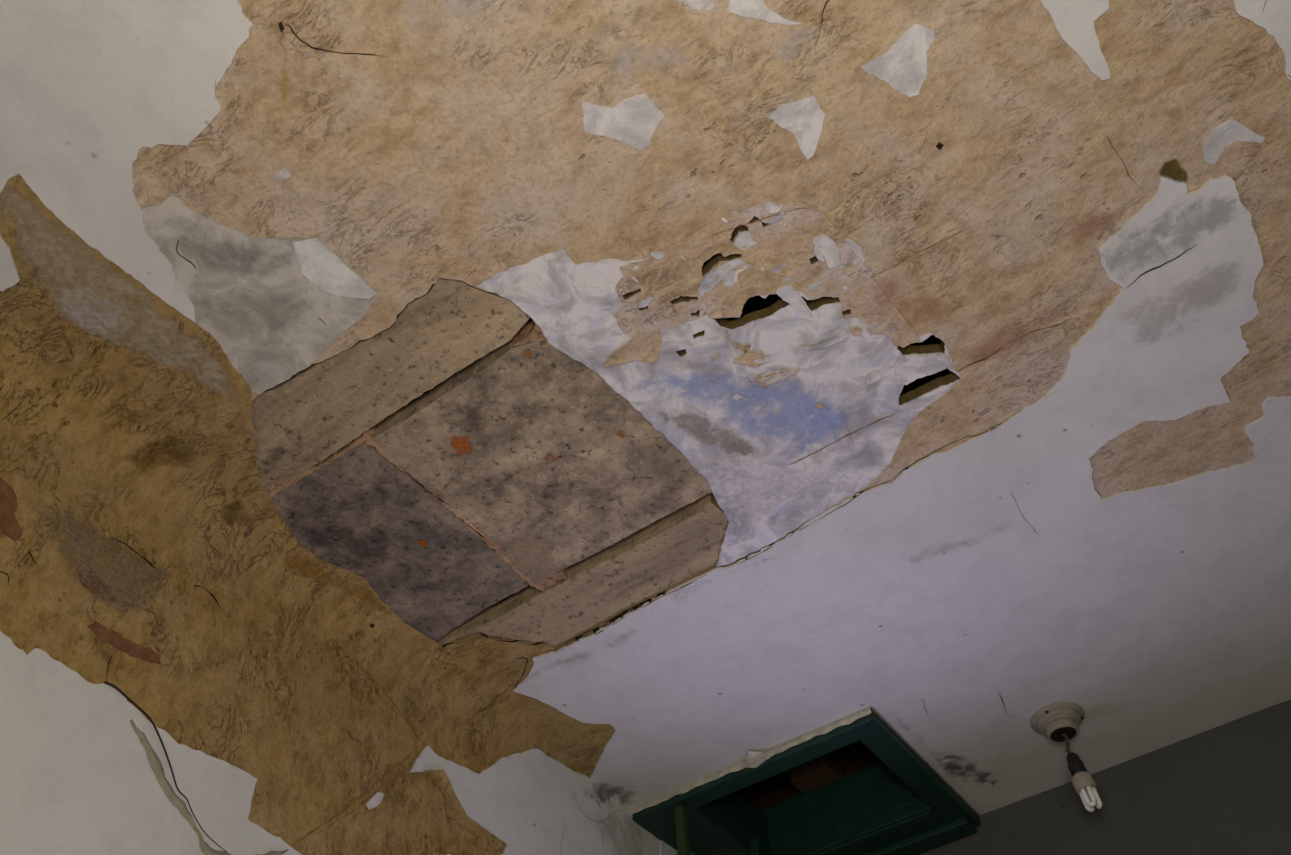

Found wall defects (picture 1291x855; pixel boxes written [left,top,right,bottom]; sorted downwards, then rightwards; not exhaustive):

peeling [0,174,615,855]
peeling [133,0,1291,567]